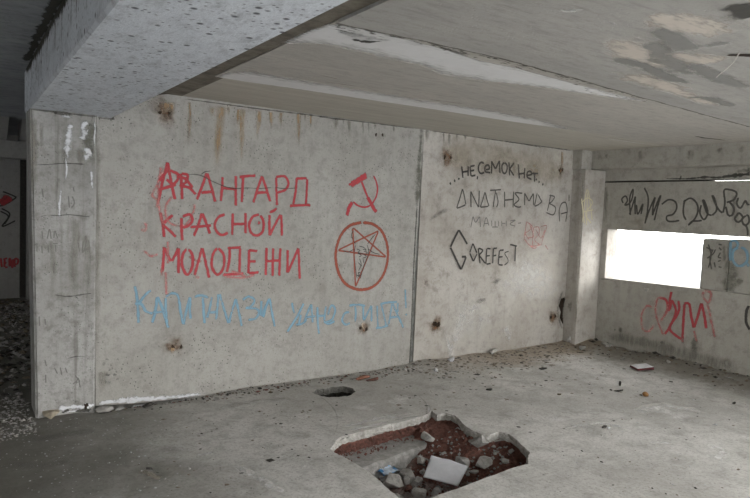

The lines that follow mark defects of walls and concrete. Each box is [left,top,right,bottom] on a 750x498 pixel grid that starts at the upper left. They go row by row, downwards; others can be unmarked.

peeling [650,13,729,37]
spalling [335,23,750,127]
rust [157,103,173,121]
damp [59,393,200,413]
spalling [334,417,526,498]